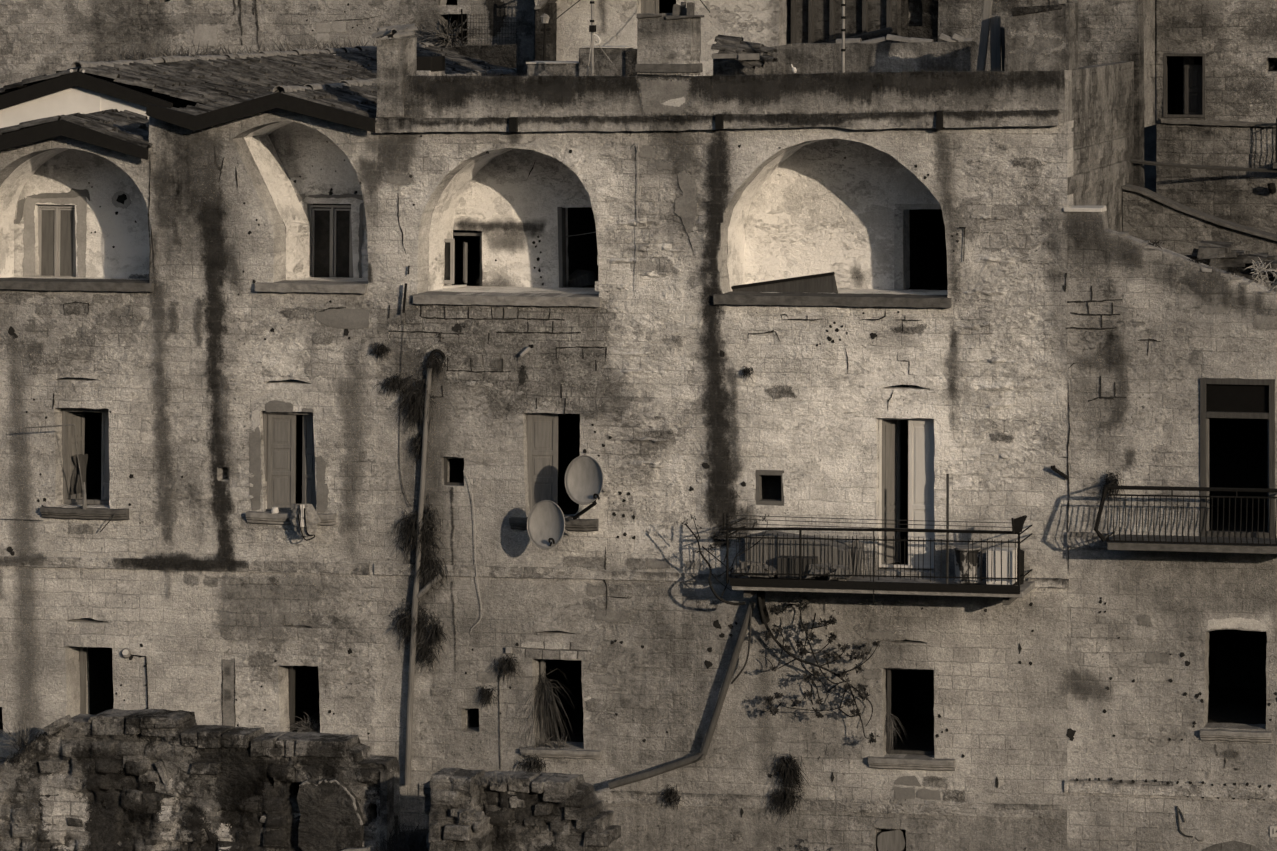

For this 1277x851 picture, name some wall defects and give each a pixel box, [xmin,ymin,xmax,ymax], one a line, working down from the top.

damp [0,372,46,743]
damp [114,137,248,595]
damp [360,65,1064,562]